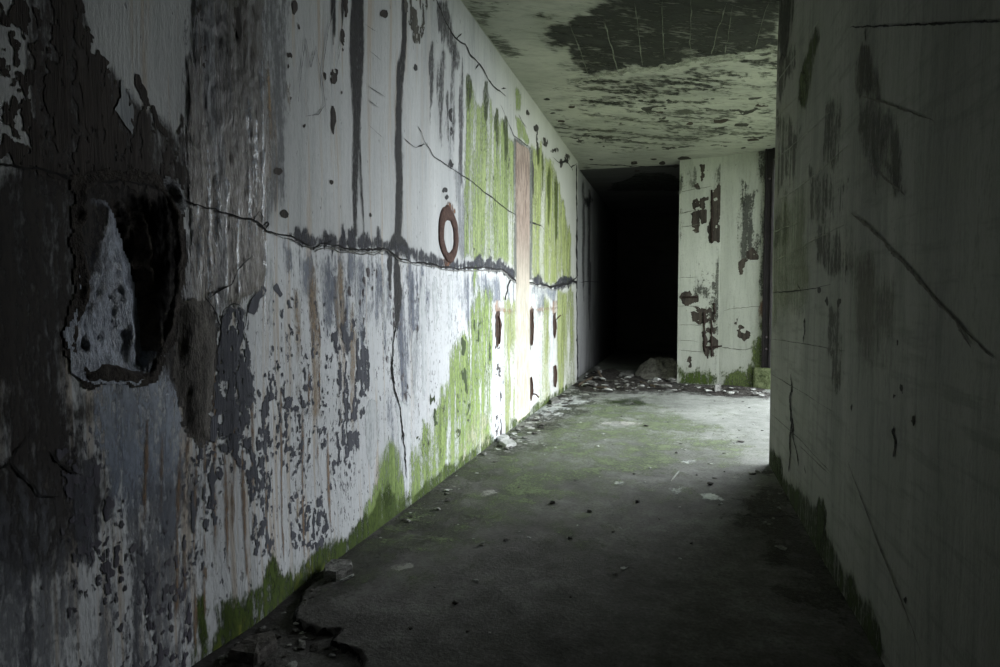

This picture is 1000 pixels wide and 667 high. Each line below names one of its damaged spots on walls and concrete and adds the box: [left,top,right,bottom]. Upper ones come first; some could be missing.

crack [0,163,71,180]
peeling [0,0,193,390]
spalling [137,231,517,667]
crack [391,321,407,477]
crack [186,157,674,380]
water stain [286,0,593,492]
corrosion [495,301,505,348]
corrosion [530,302,561,346]
spalling [679,291,718,359]
spalling [734,319,751,341]
spalling [738,247,759,275]
crack [851,213,995,359]